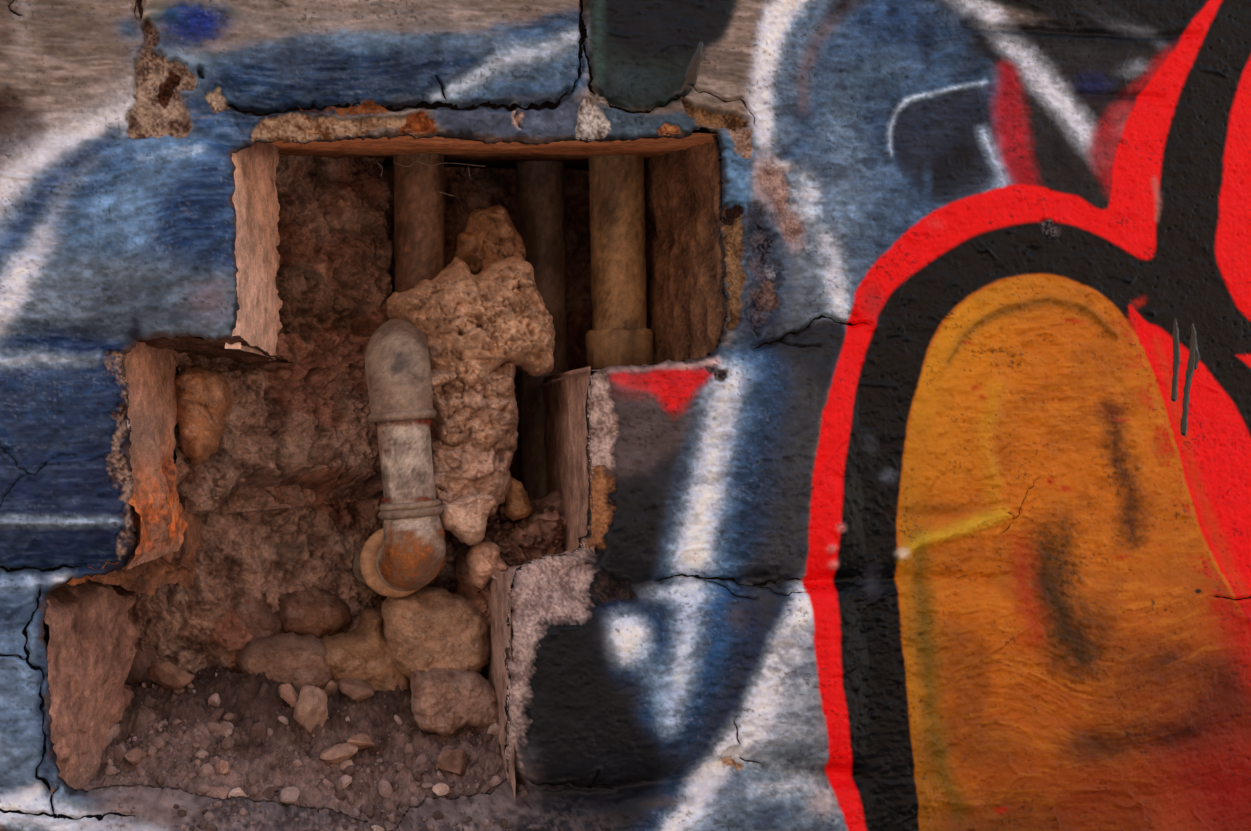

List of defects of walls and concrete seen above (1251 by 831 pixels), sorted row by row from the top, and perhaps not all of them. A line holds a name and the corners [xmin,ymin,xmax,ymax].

crack [134,0,143,19]
crack [753,315,870,349]
peeling [705,366,732,383]
spalling [102,349,135,561]
corrosion [378,530,447,591]
spalling [505,370,639,776]
crack [0,564,135,821]
peeling [717,744,744,772]